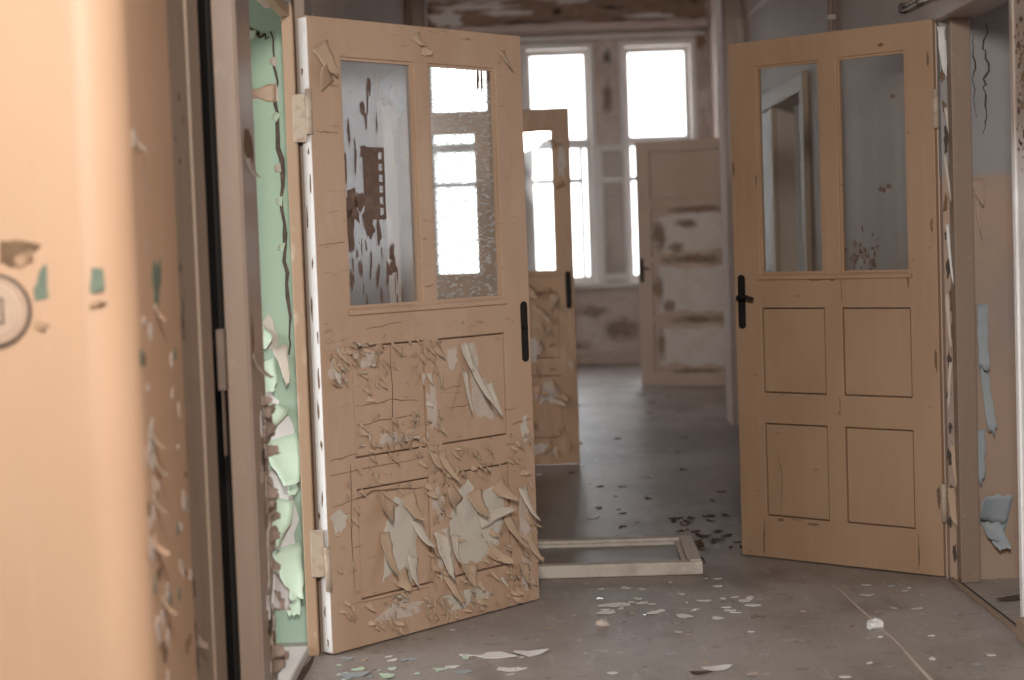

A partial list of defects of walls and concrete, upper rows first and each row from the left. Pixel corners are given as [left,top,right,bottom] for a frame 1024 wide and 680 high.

peeling [411,0,707,56]
spalling [696,30,709,93]
crack [972,23,990,133]
peeling [0,240,49,302]
peeling [89,268,107,310]
peeling [140,259,167,368]
peeling [977,304,1013,551]
peeling [147,388,196,680]
peeling [251,312,304,680]